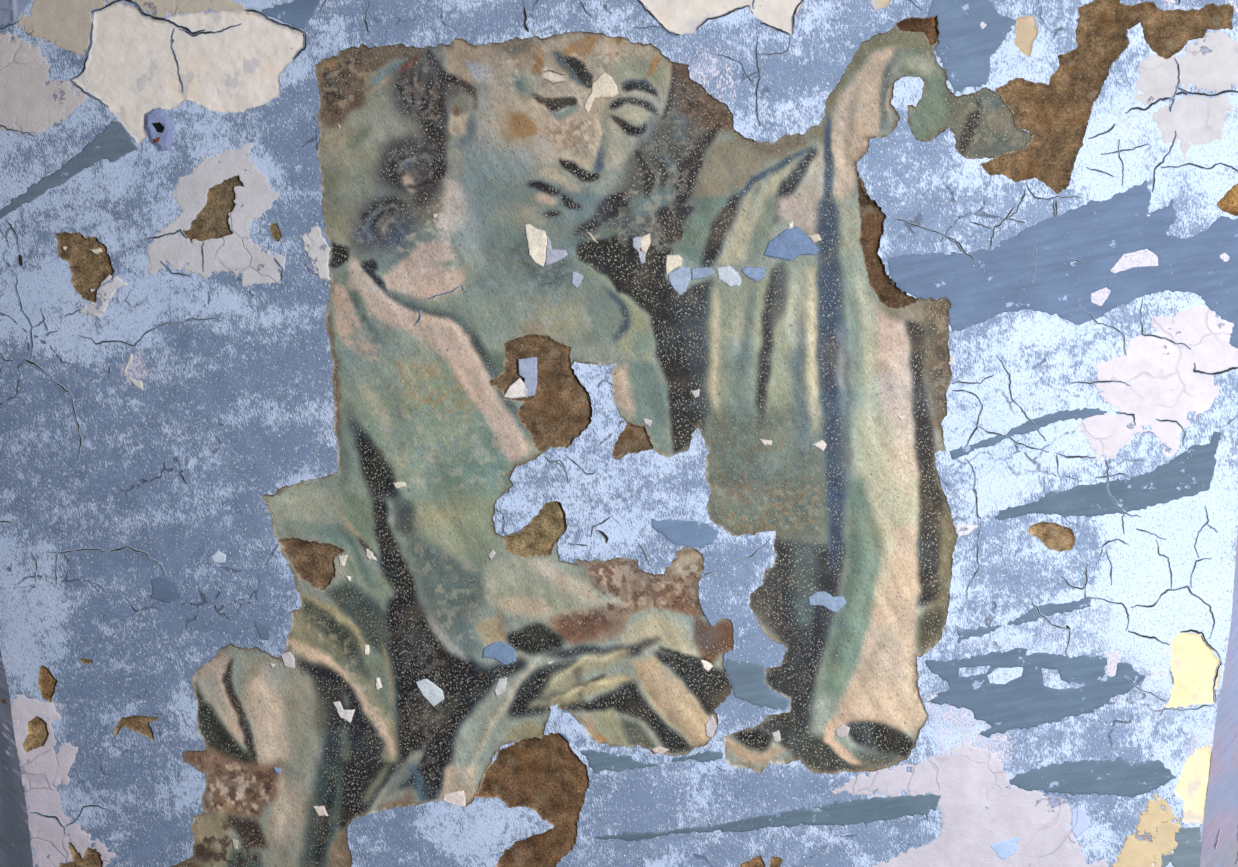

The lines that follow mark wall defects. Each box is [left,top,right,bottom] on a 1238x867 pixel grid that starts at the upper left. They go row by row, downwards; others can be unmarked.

peeling [0,0,305,144]
spalling [980,0,1238,194]
spalling [55,232,128,319]
crack [0,219,221,462]
peeling [146,142,286,287]
crack [274,258,284,281]
spalling [489,333,592,452]
crack [895,58,1238,284]
crack [1067,298,1238,446]
crack [952,356,1222,716]
spalling [474,732,590,867]
peeling [823,742,1108,867]